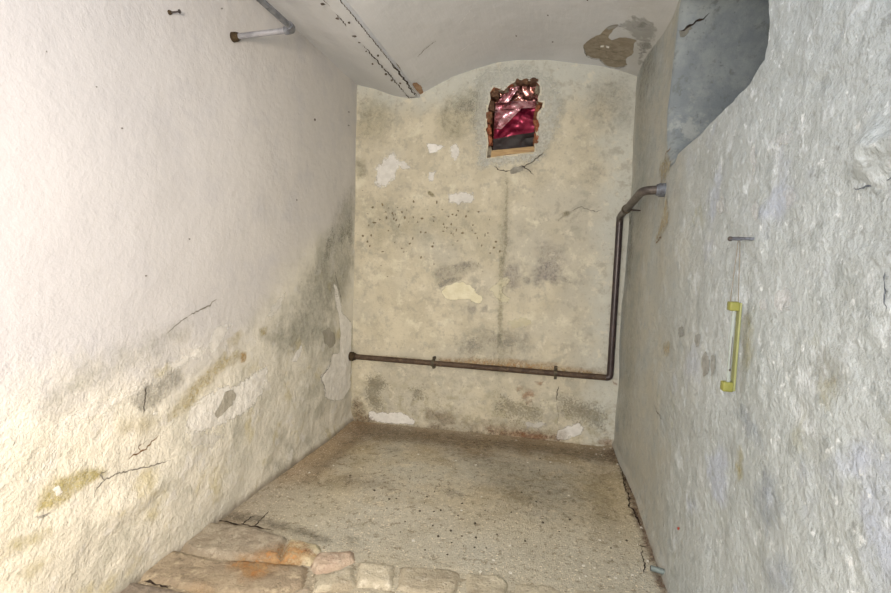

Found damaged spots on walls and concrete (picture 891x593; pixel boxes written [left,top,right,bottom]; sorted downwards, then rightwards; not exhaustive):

spalling [583,25,636,69]
crack [680,13,709,37]
spalling [486,77,544,174]
damp [362,191,500,253]
peeling [441,277,510,303]
peeling [321,272,352,400]
damp [56,324,231,433]
peeling [187,367,268,433]
peeling [369,411,415,425]
damp [38,471,101,518]
crack [94,435,168,497]
crack [620,467,646,572]